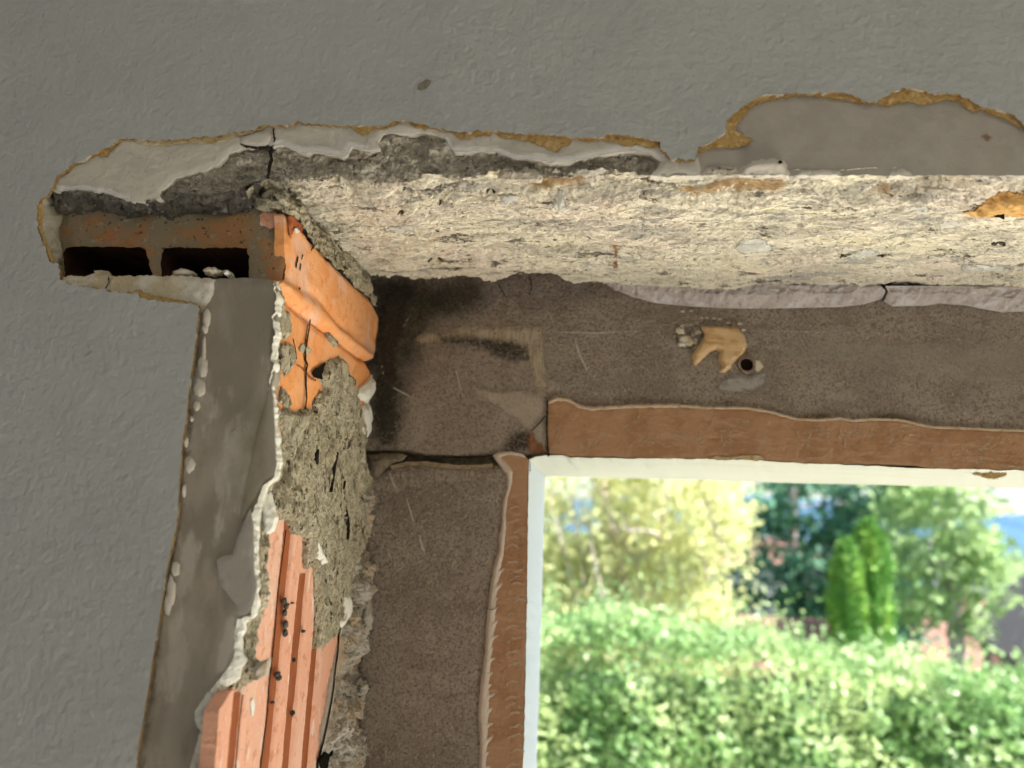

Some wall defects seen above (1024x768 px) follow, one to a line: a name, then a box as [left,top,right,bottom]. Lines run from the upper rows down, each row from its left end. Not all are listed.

crack [240,128,276,179]
peeling [37,89,1024,312]
crack [293,319,316,409]
spalling [312,363,326,380]
flaking render [190,282,287,768]